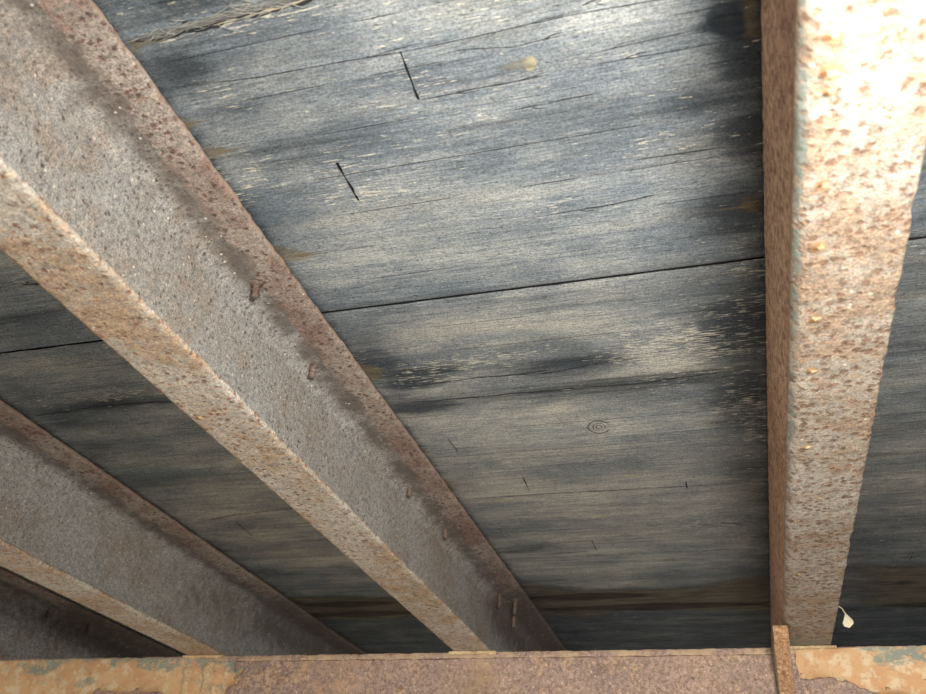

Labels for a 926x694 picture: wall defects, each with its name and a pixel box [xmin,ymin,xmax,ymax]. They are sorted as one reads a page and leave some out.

crack [124,0,312,46]
water stain [702,4,743,38]
crack [174,0,655,88]
crack [591,31,749,65]
corrosion [820,62,841,96]
water stain [289,597,416,620]
water stain [520,577,771,617]
peeling [0,658,243,694]
peeling [796,646,926,694]